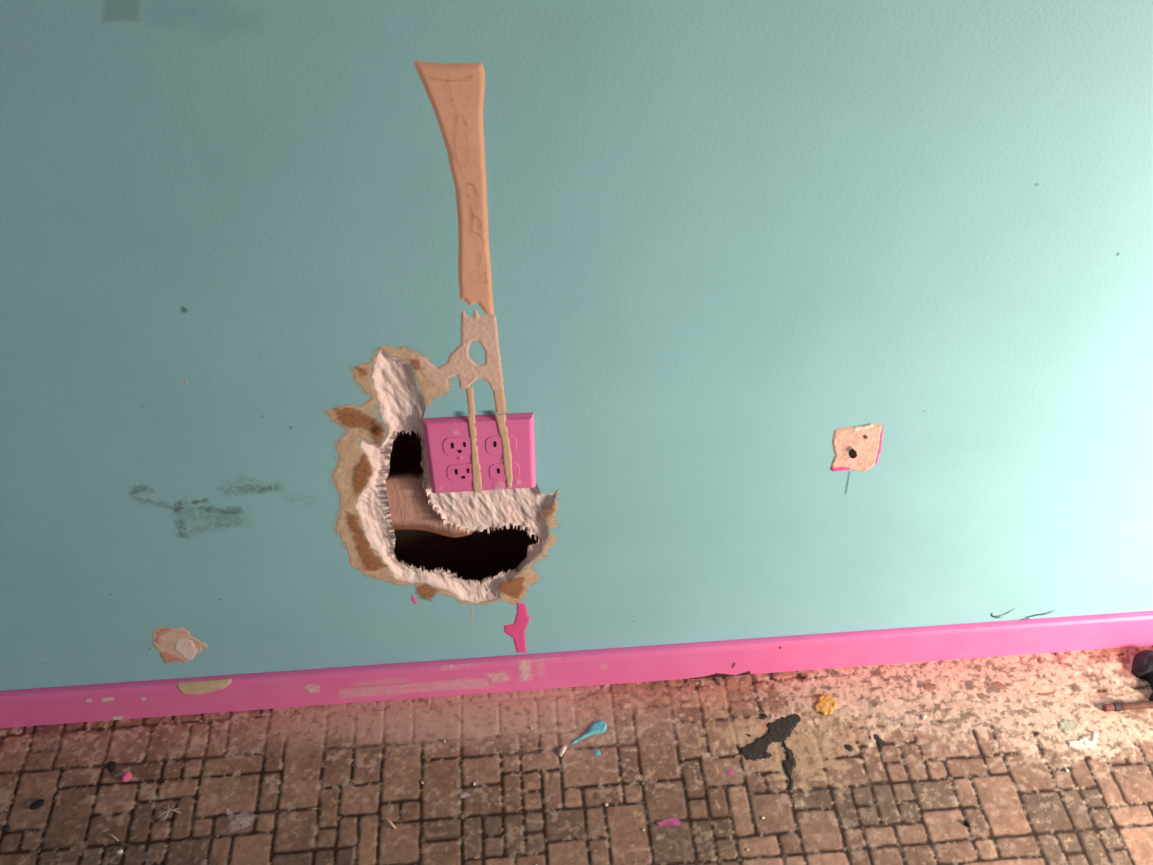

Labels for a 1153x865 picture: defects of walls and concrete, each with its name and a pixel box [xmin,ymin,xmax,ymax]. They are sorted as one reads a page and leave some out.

peeling [831,424,884,472]
spalling [326,345,559,605]
peeling [152,627,208,663]